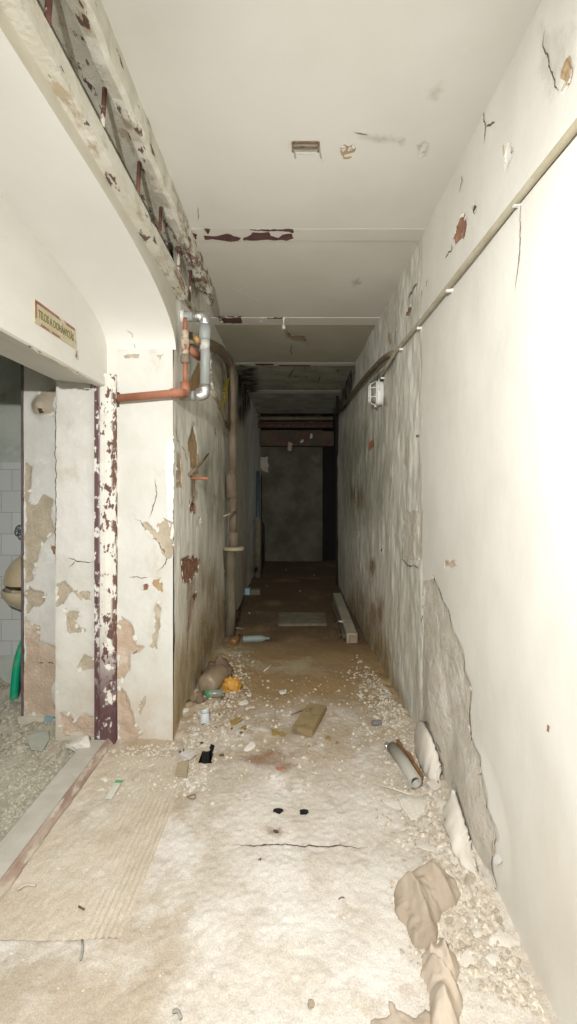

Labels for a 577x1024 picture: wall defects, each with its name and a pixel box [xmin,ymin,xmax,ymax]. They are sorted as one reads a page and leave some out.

crack [542,30,559,90]
flaking render [340,145,356,159]
flaking render [453,205,477,244]
flaking render [23,463,94,738]
flaking render [117,579,169,762]
flaking render [420,579,496,888]
crack [235,842,360,850]